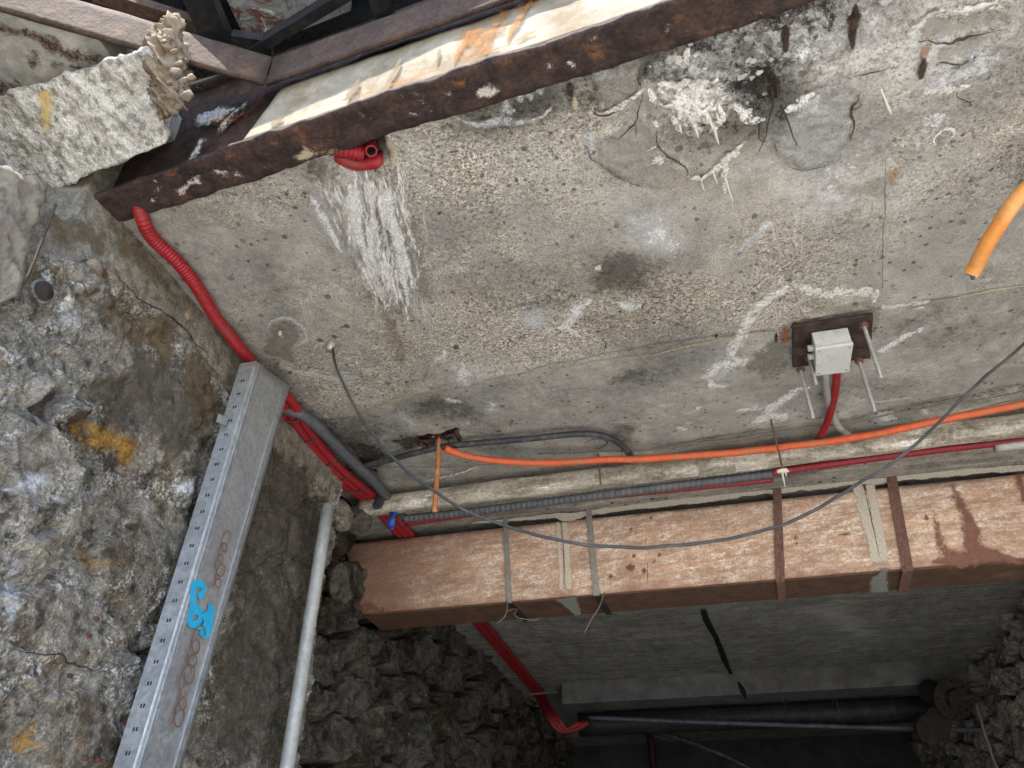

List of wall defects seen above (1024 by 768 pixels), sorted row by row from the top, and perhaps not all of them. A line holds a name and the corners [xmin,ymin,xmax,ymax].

corrosion [453,2,535,62]
spalling [649,0,893,124]
crack [609,70,643,139]
damp [648,78,728,144]
damp [308,153,431,354]
corrosion [924,485,1024,569]
corrosion [1015,474,1024,501]
crack [701,610,747,700]